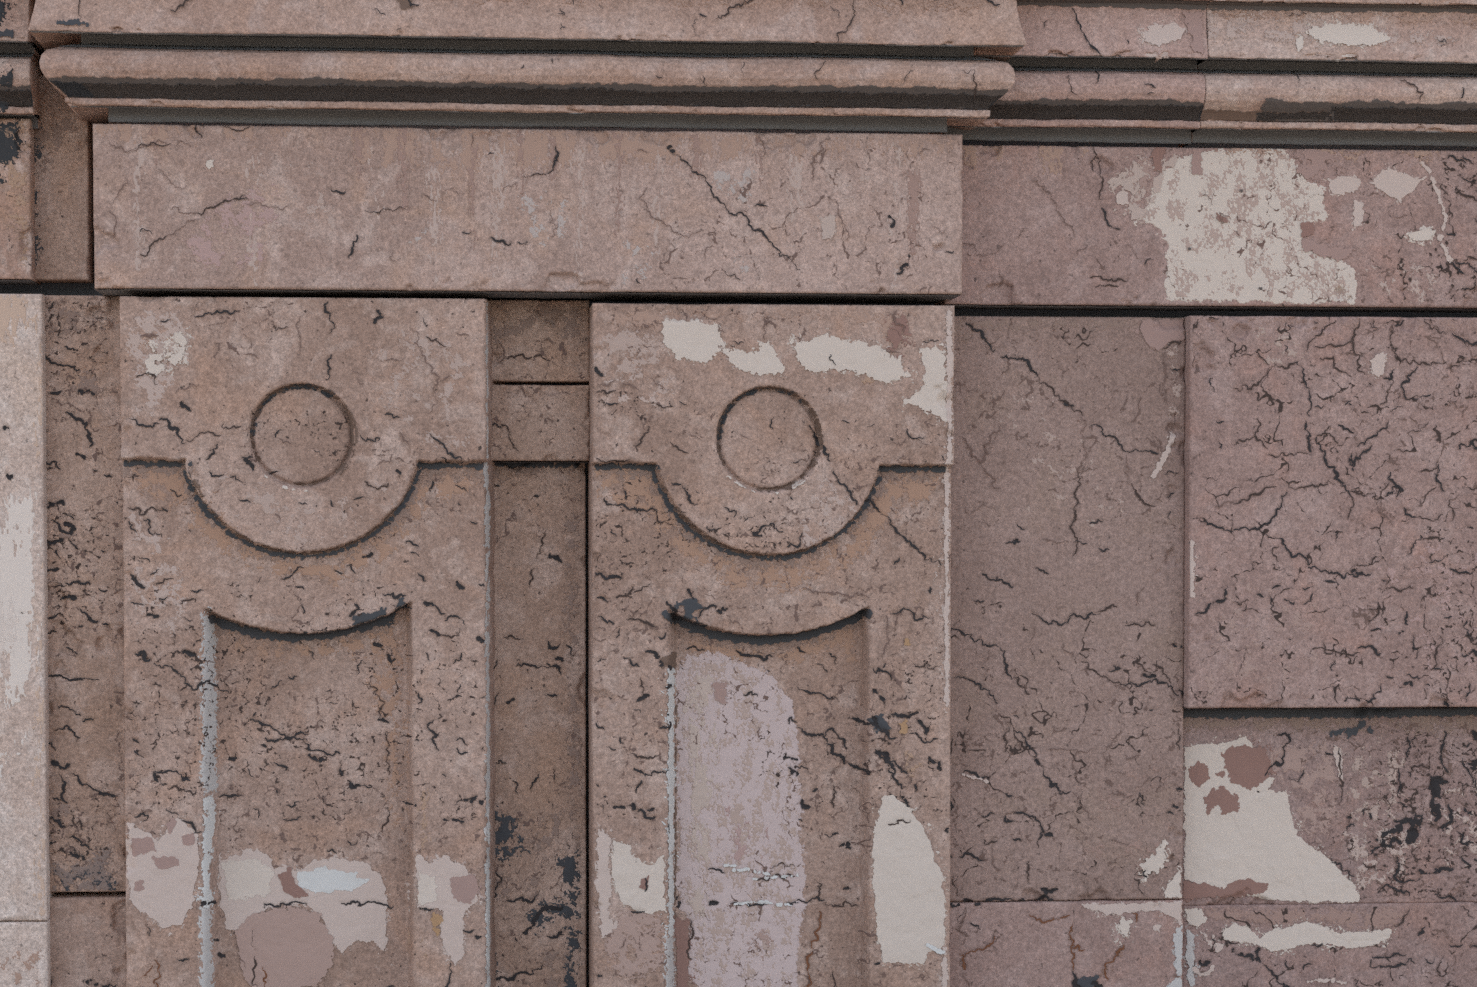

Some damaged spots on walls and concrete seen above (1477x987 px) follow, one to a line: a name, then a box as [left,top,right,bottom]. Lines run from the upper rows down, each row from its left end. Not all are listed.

peeling [1191,148,1203,175]
peeling [1296,149,1337,182]
crack [348,188,464,259]
peeling [1300,221,1353,262]
crack [492,137,1477,987]
crack [45,298,564,987]
peeling [712,682,758,704]
peeling [1168,740,1372,844]
peeling [126,808,388,958]
peeling [1182,878,1425,970]